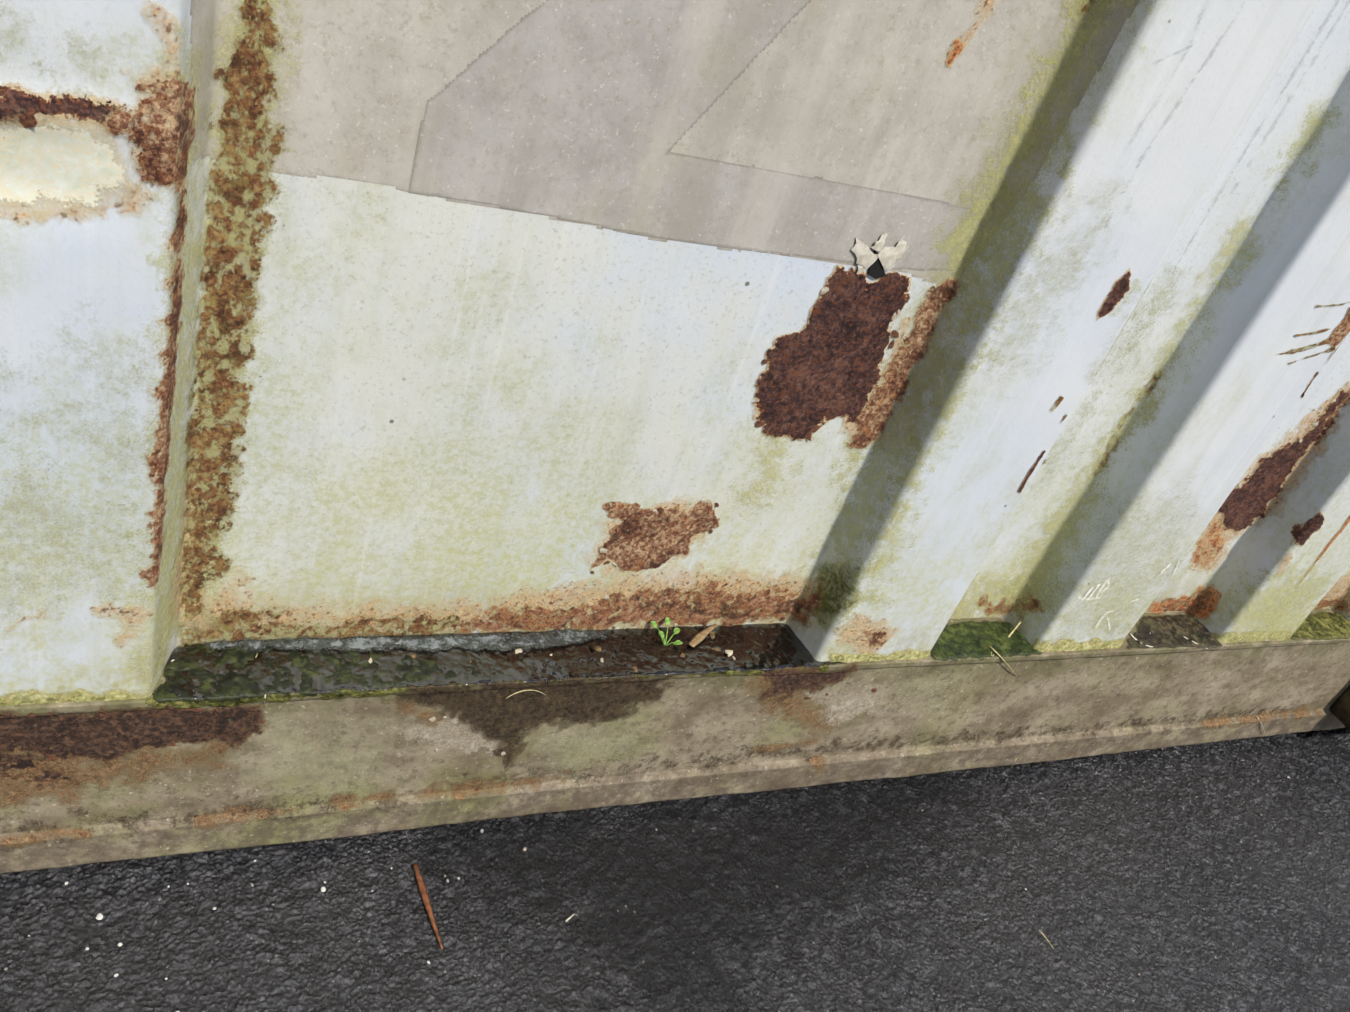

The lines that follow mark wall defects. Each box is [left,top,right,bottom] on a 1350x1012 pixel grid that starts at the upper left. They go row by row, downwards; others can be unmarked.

corrosion [946,0,994,66]
corrosion [0,0,828,648]
corrosion [737,232,960,507]
corrosion [1097,270,1138,320]
corrosion [1092,370,1162,476]
corrosion [1149,372,1350,620]
corrosion [954,576,1052,625]
water stain [391,674,670,767]
corrosion [0,614,1322,848]